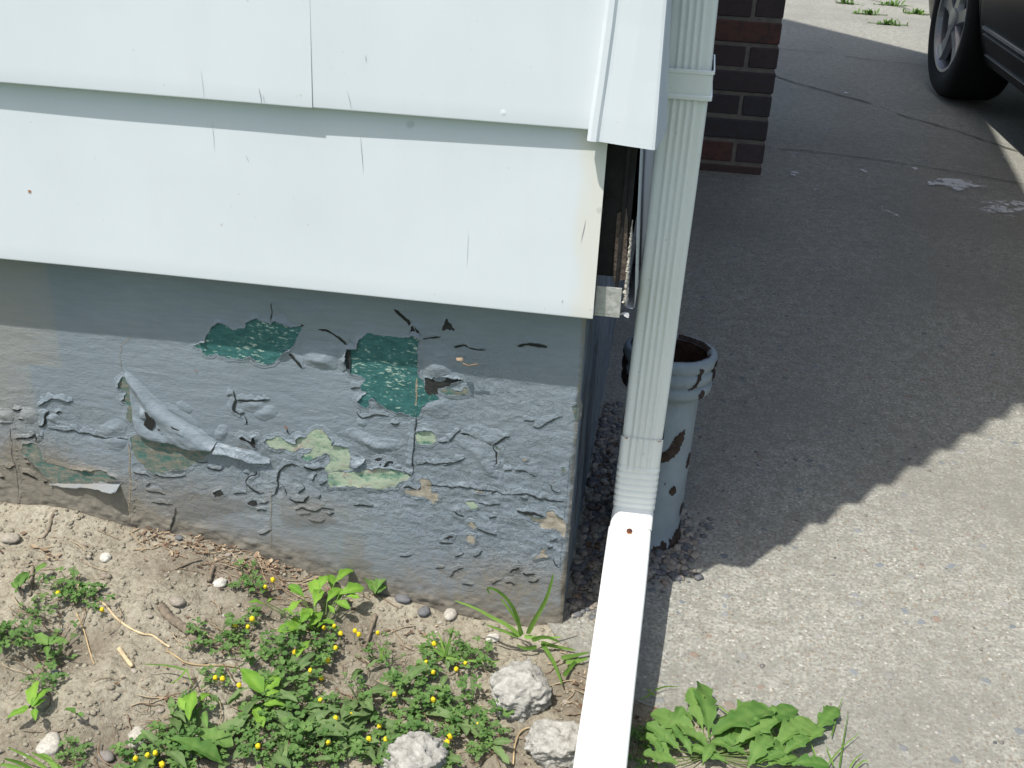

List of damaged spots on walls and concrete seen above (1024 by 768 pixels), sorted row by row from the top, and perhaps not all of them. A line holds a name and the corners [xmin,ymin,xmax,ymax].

peeling [190,312,305,369]
crack [394,306,486,351]
crack [516,335,548,348]
peeling [337,312,474,448]
peeling [113,372,442,506]
peeling [18,438,124,494]
spalling [441,499,481,546]
spalling [523,506,571,541]
spalling [506,546,551,575]